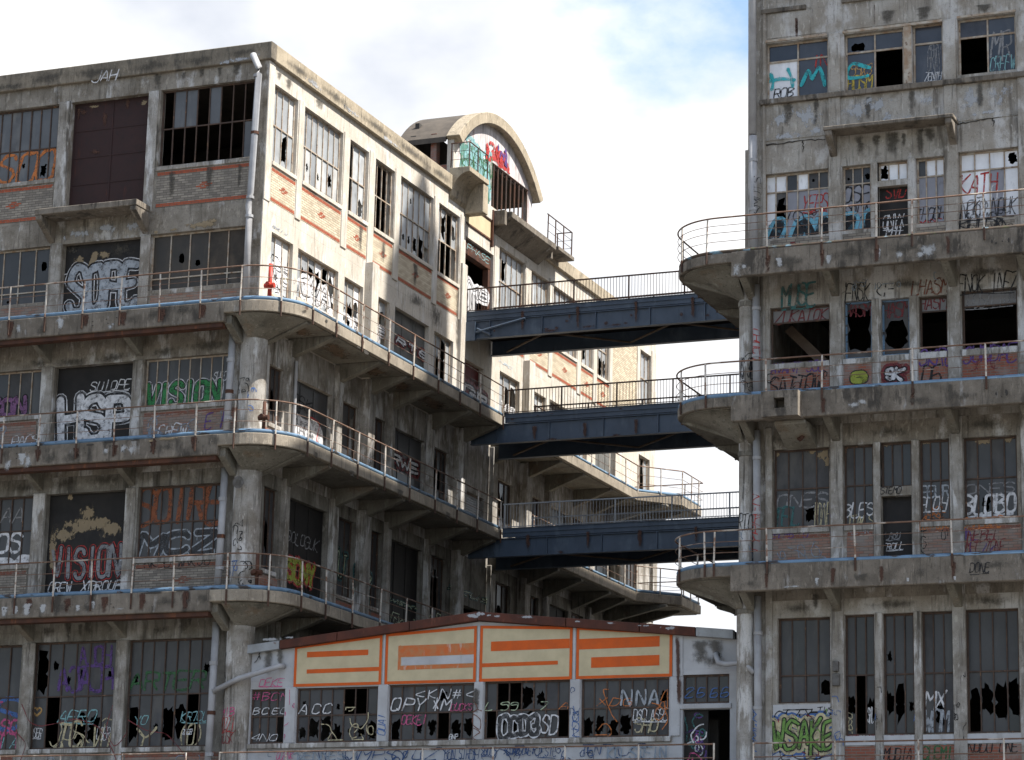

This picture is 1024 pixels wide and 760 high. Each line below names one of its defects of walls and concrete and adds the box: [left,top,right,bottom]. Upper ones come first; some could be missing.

crack [766,139,825,151]
water stain [856,129,934,151]
water stain [265,650,283,668]
water stain [693,641,721,664]